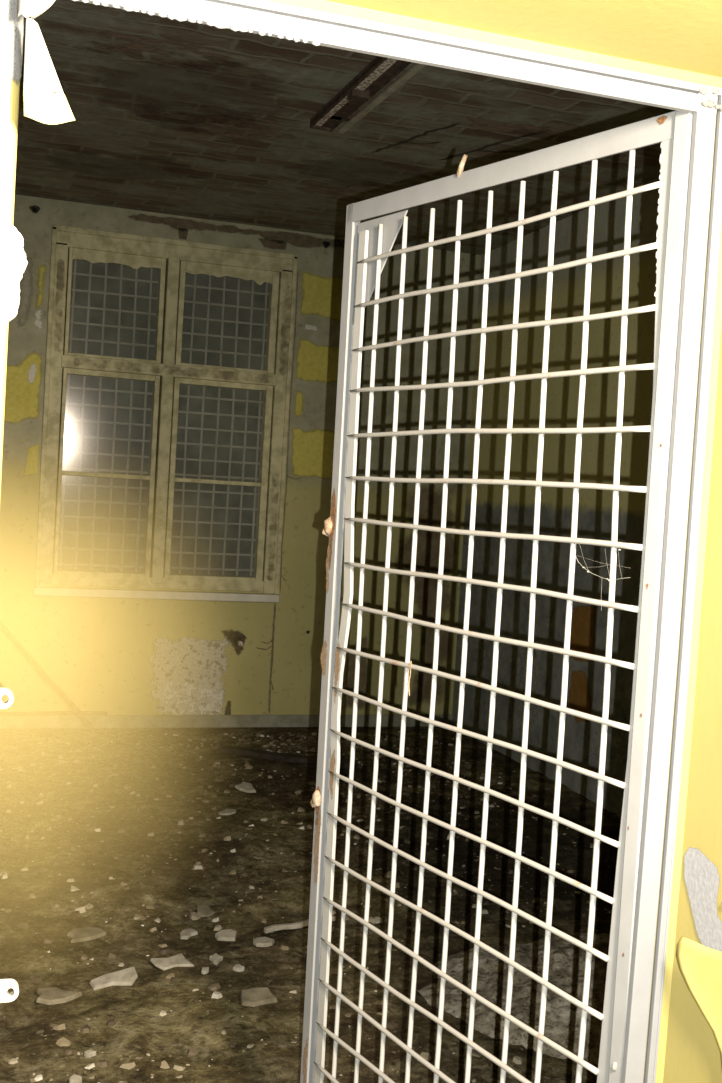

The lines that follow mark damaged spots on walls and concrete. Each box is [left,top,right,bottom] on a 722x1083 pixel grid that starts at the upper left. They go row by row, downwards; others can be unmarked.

peeling [0,0,75,125]
peeling [4,353,42,423]
peeling [280,273,343,479]
peeling [149,630,246,715]
peeling [676,847,722,1065]